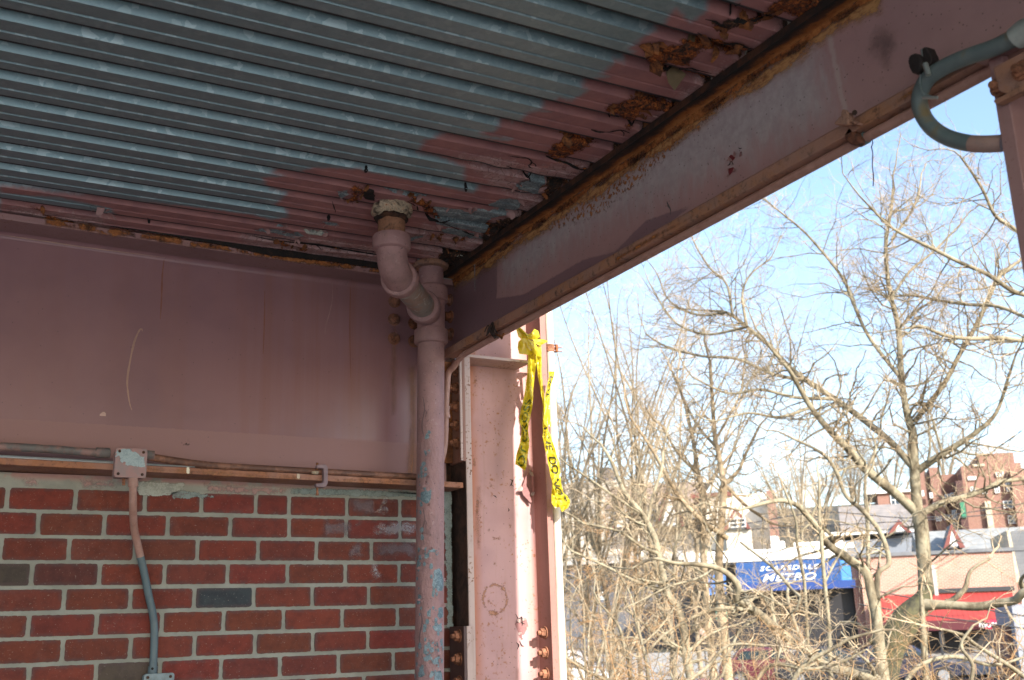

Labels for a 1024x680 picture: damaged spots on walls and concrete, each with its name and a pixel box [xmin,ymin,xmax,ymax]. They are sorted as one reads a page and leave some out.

corrosion [31,205,379,273]
peeling [433,172,548,242]
corrosion [408,0,881,287]
peeling [415,527,446,680]